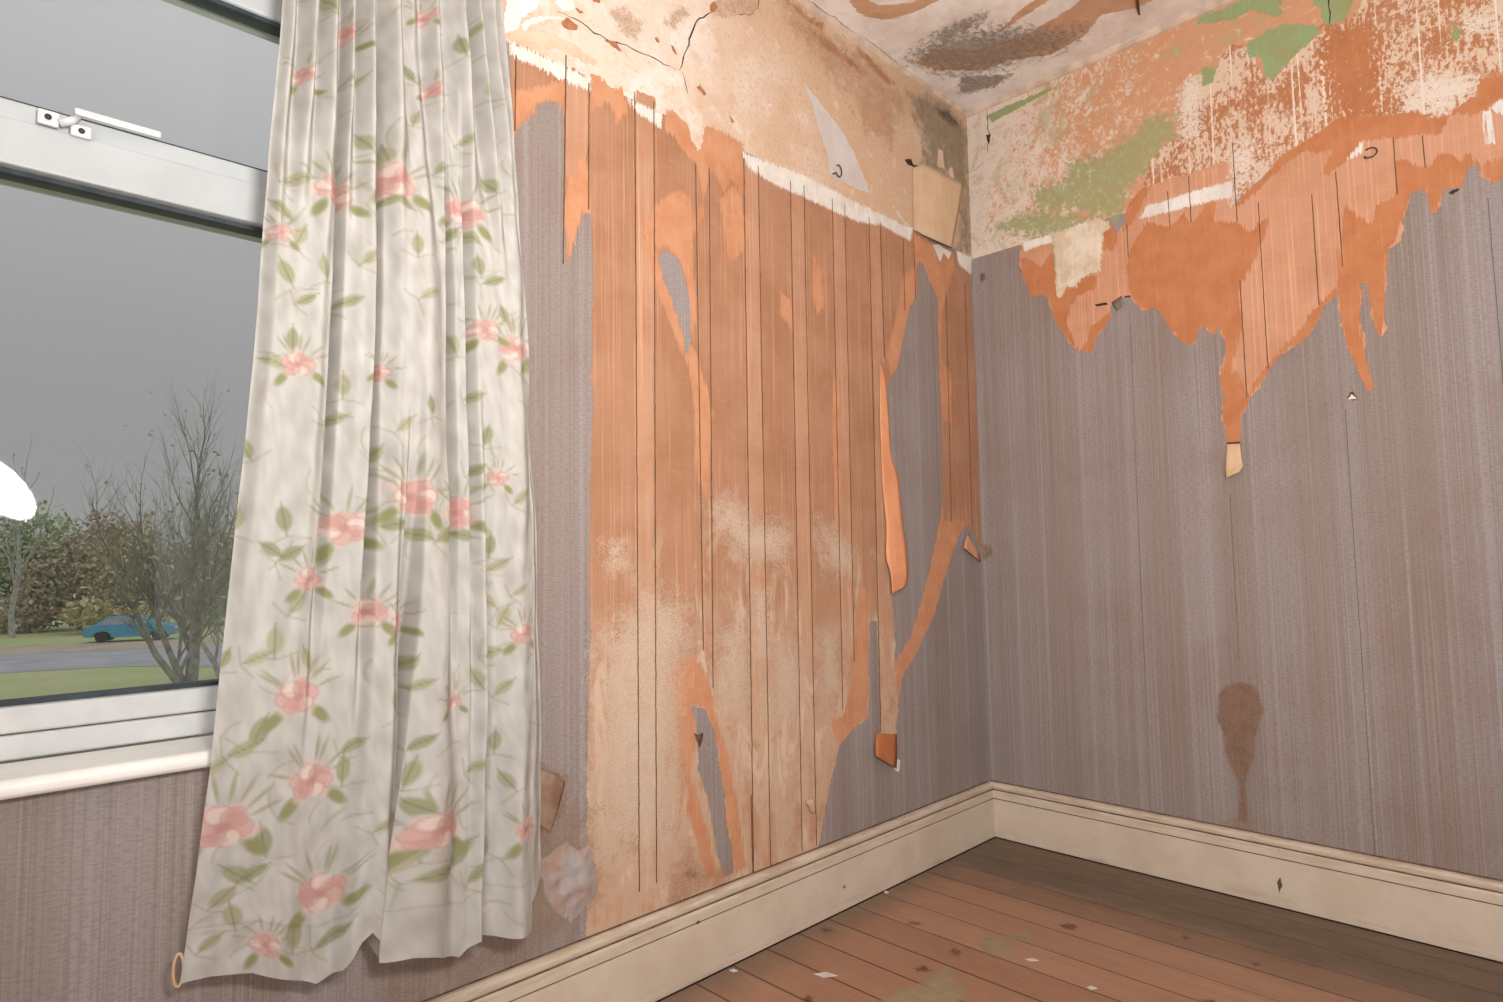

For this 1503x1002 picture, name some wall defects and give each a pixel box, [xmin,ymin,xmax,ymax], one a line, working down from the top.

crack [560,0,759,93]
crack [808,0,895,61]
peeling [916,0,1152,71]
water stain [897,9,1099,256]
peeling [987,0,1503,298]
peeling [880,359,908,595]
water stain [1216,680,1265,832]